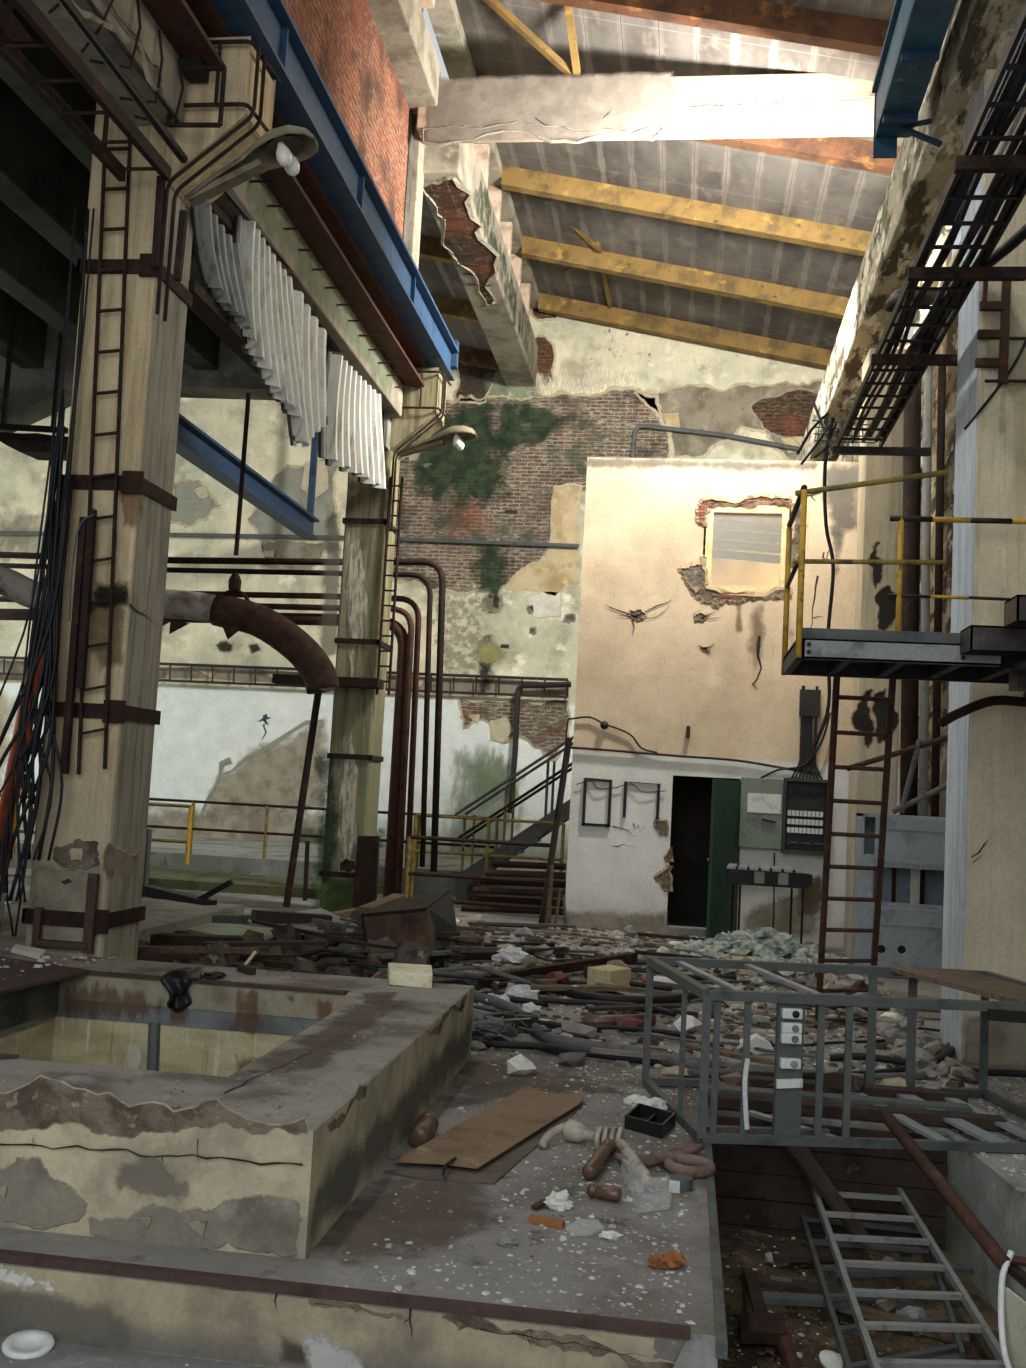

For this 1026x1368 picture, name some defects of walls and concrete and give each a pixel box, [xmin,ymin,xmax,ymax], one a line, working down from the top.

spalling [423,176,500,306]
water stain [983,294,1026,391]
flaking render [392,309,823,614]
corrosion [217,641,232,652]
crack [608,600,718,654]
flaking render [390,674,572,762]
spalling [51,836,138,885]
flaking render [0,948,468,1139]
crack [0,1138,303,1166]
crack [403,1309,412,1337]
crack [480,1328,644,1360]